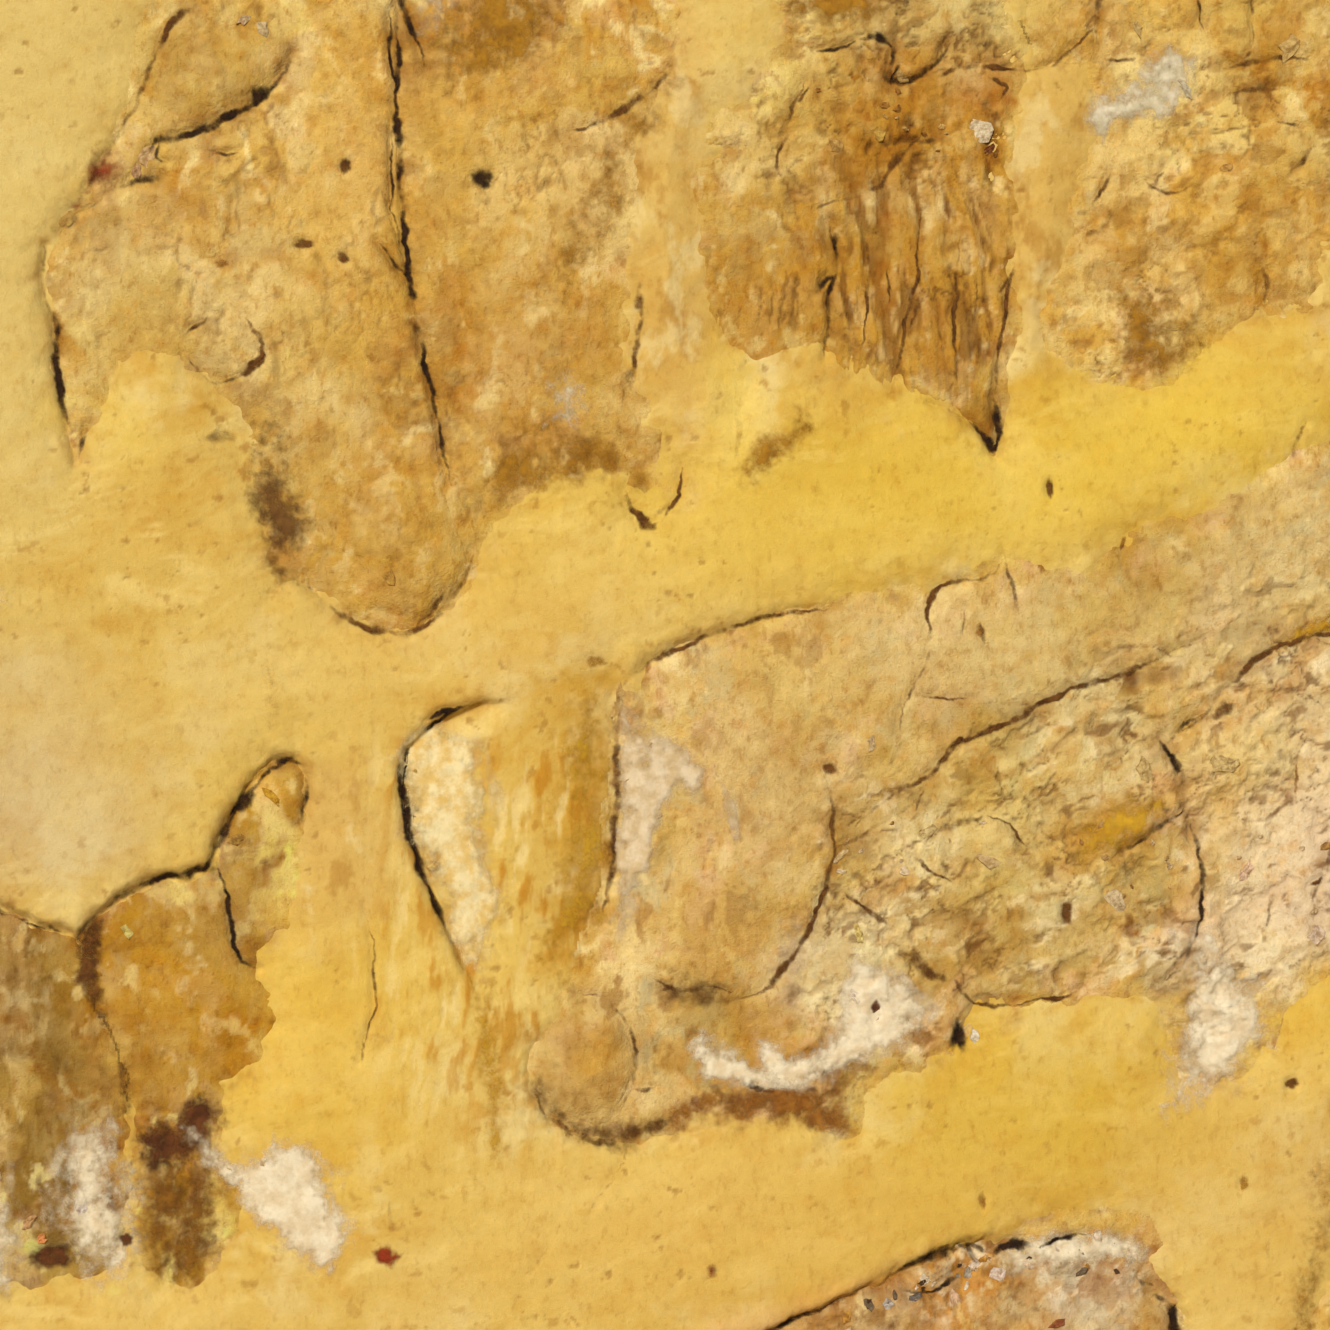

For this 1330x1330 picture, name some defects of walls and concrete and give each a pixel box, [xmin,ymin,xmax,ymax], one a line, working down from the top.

spalling [45,0,681,630]
crack [384,0,447,466]
spalling [690,0,1330,457]
peeling [397,725,501,962]
spalling [527,440,1330,1145]
spalling [0,759,347,1290]
leakage [666,985,716,1004]
leakage [690,959,936,1089]
leakage [0,1201,16,1284]
leakage [62,1125,133,1269]
spalling [778,1206,1185,1330]
spalling [1307,1272,1330,1330]